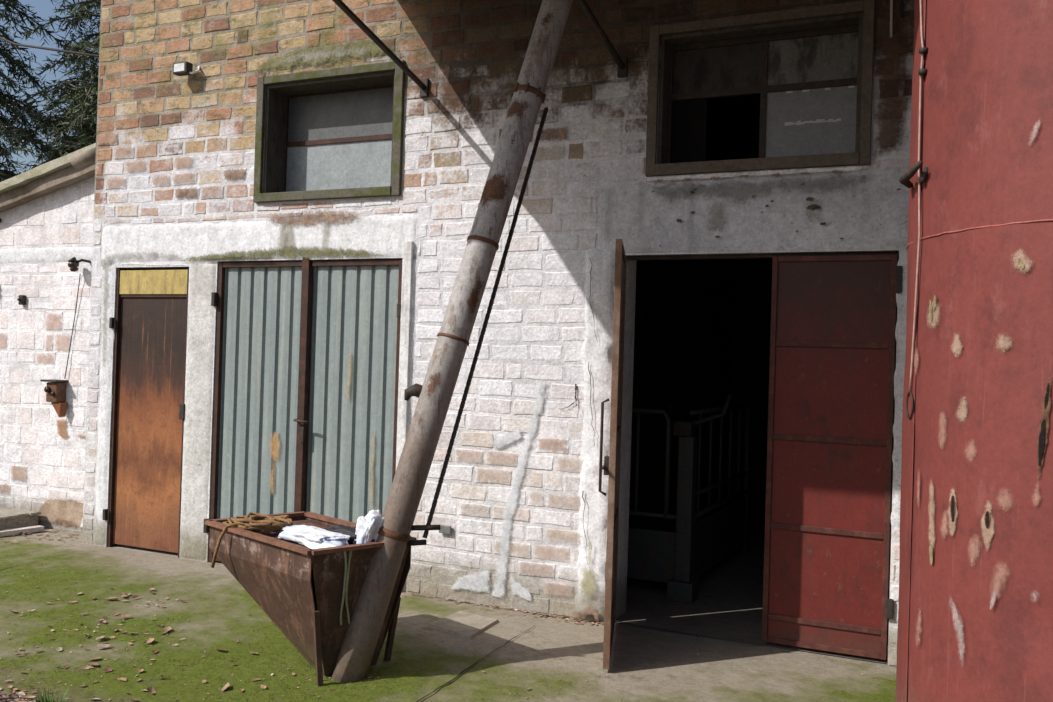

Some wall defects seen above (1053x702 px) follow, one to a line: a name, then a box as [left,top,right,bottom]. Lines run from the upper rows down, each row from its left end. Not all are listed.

peeling [1013,251,1031,271]
corrosion [270,433,280,493]
peeling [917,473,957,564]
peeling [970,492,1011,563]
peeling [990,565,1006,608]